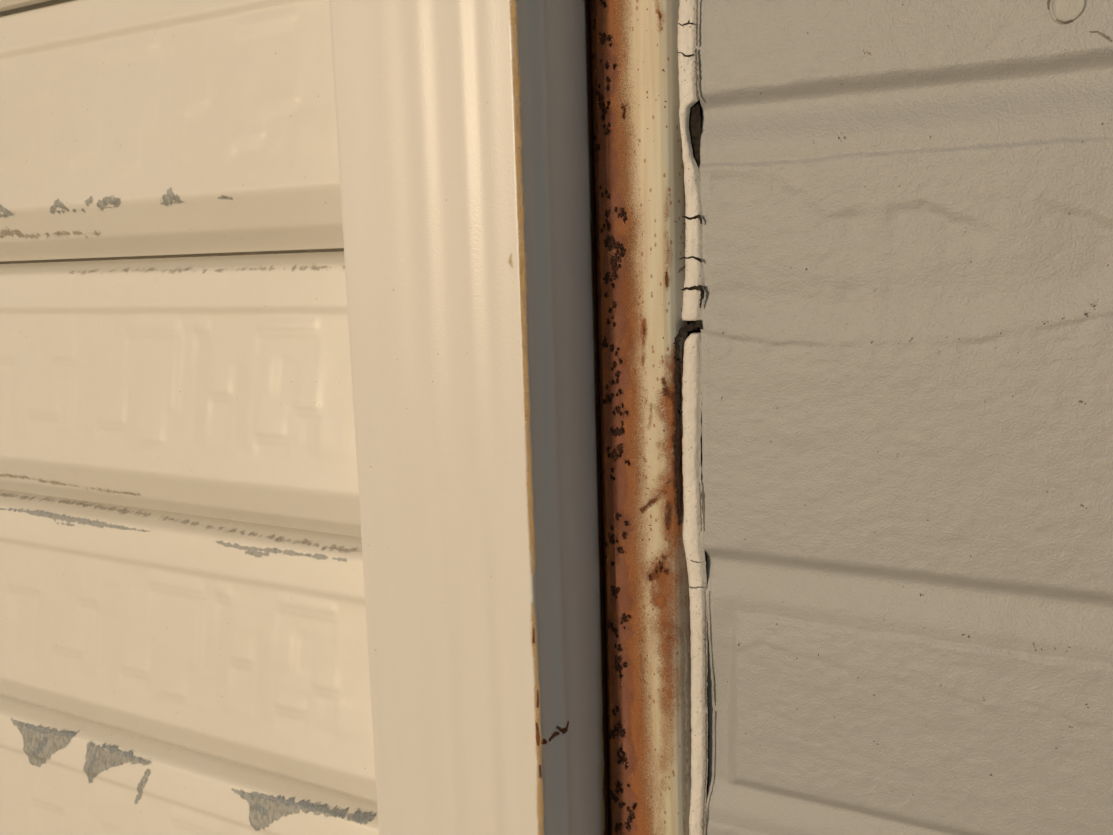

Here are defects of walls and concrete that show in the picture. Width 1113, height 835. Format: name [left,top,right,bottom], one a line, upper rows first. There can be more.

peeling [50,195,121,215]
peeling [160,187,183,206]
crack [674,214,702,229]
crack [674,256,705,532]
corrosion [582,0,690,835]
peeling [0,507,150,532]
peeling [215,540,347,562]
crack [683,560,708,835]
peeling [11,719,151,805]
peeling [232,789,377,831]